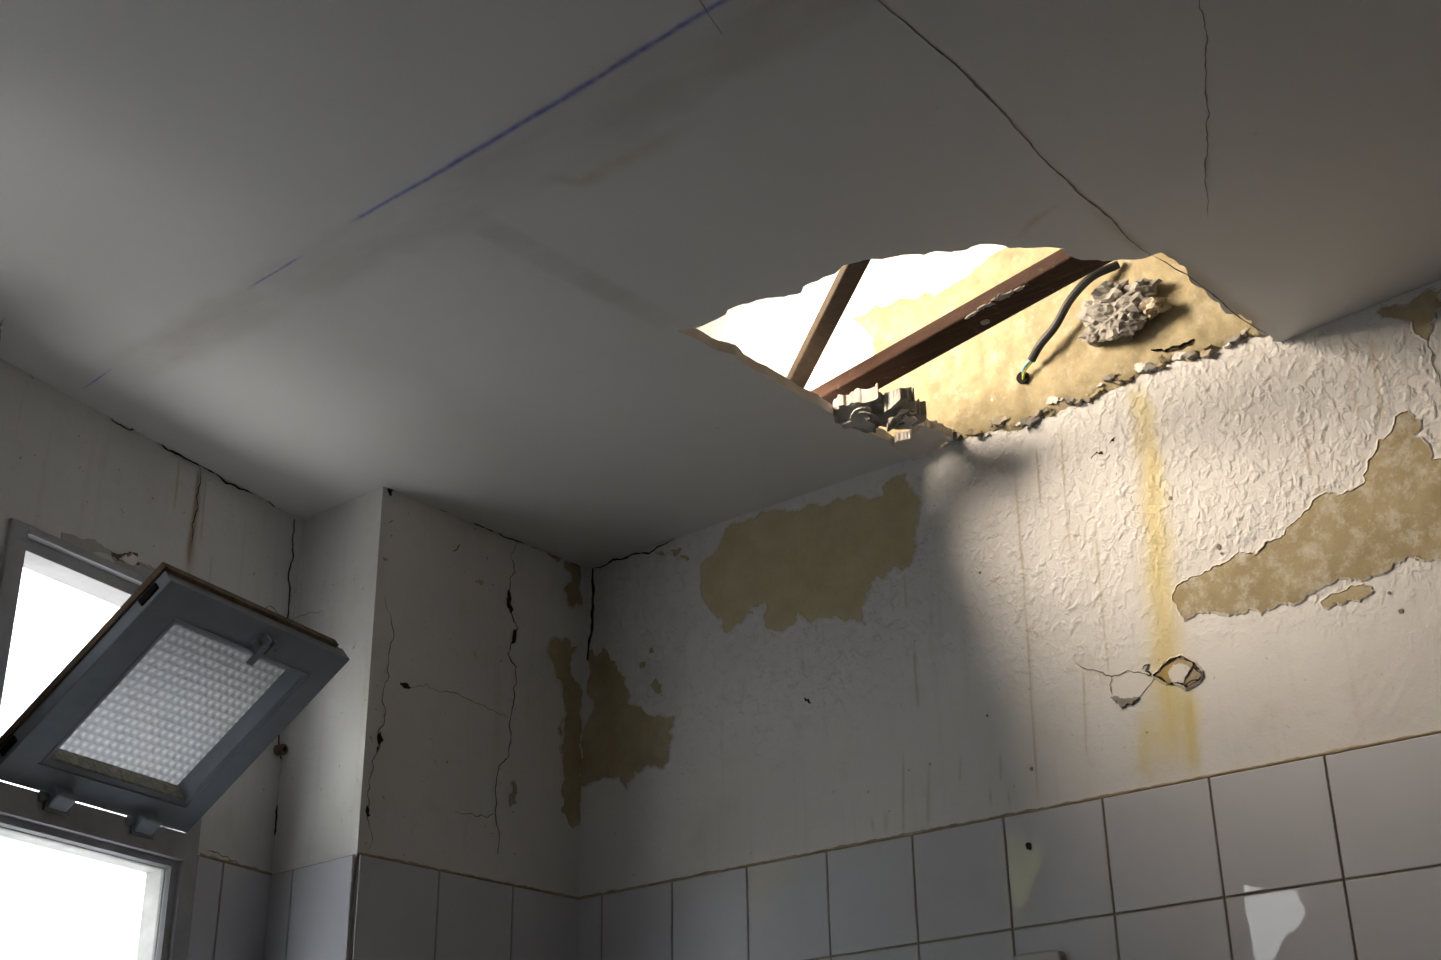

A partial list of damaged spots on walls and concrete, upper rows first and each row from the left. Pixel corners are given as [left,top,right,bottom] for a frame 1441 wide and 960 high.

crack [879,0,1273,338]
spalling [854,247,1061,355]
spalling [878,252,1263,447]
peeling [1375,286,1441,386]
peeling [656,472,923,635]
peeling [1171,409,1441,622]
crack [366,509,674,847]
peeling [546,635,677,831]